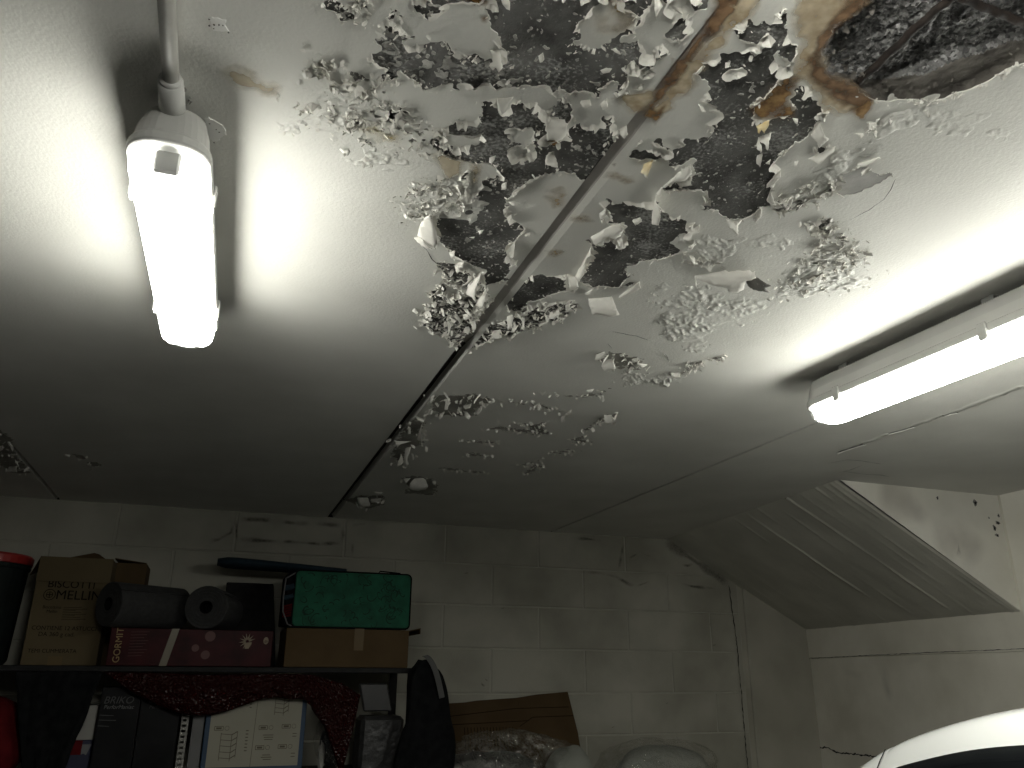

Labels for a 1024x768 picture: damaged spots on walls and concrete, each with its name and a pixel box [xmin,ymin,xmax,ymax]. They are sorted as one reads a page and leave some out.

corrosion [623,0,759,121]
spalling [820,0,1024,139]
peeling [292,0,893,354]
peeling [386,388,618,496]
crack [836,386,1024,454]
crack [728,585,748,765]